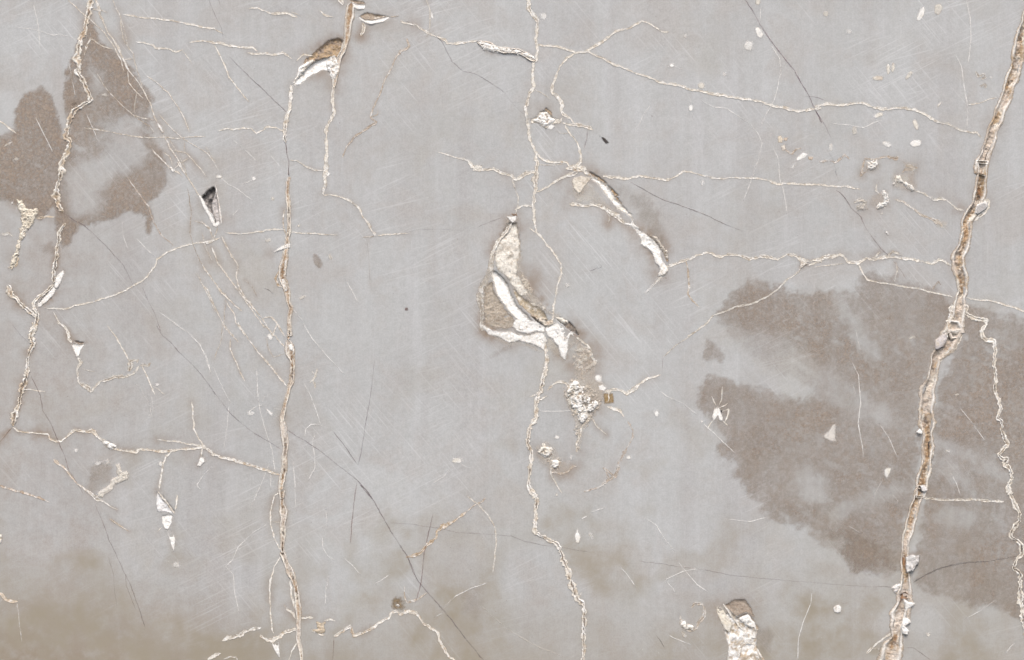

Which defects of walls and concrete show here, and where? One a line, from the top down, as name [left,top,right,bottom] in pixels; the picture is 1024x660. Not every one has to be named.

spalling [293,0,414,87]
water stain [0,25,162,269]
spalling [199,185,222,227]
crack [0,0,497,660]
spalling [476,212,591,367]
spalling [547,379,607,452]
spalling [562,166,669,293]
crack [219,0,1024,660]
water stain [732,289,931,399]
water stain [936,321,1024,465]
spalling [156,492,178,550]
spalling [717,600,764,660]